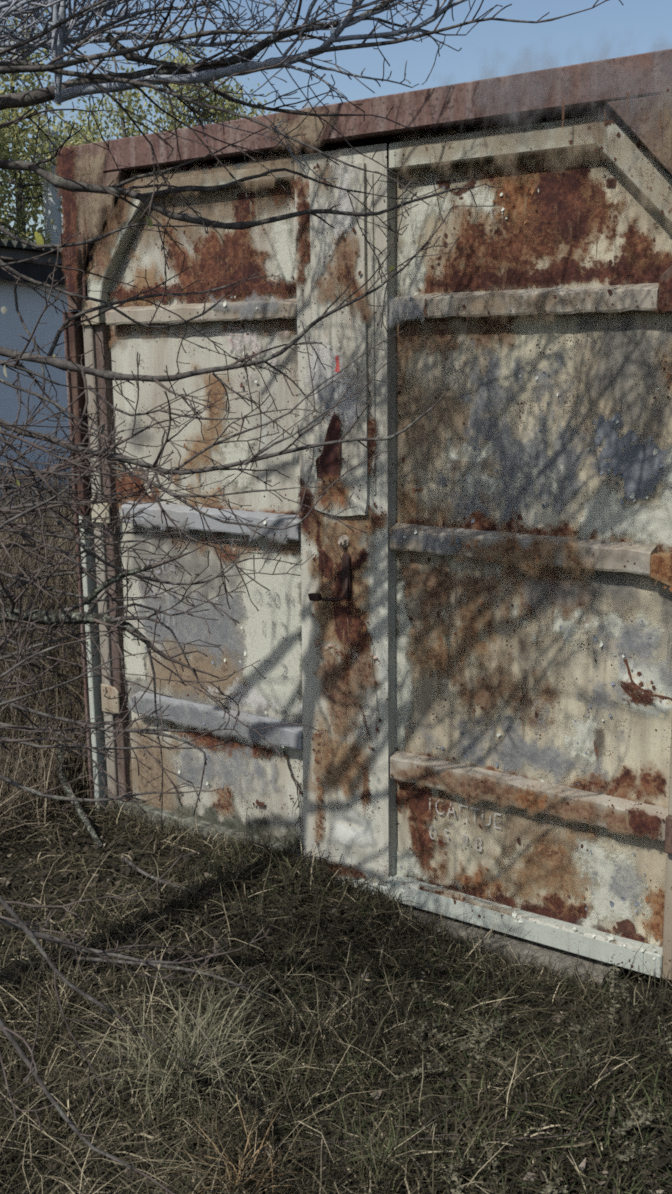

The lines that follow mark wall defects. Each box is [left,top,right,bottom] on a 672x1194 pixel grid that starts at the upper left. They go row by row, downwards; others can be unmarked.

corrosion [108,324,181,346]
corrosion [55,144,372,320]
corrosion [221,319,294,337]
corrosion [396,117,672,466]
corrosion [115,464,168,507]
peeling [438,351,672,533]
corrosion [172,367,636,844]
corrosion [650,544,672,676]
corrosion [618,681,662,706]
corrosion [129,718,282,812]
corrosion [319,858,366,878]
corrosion [390,748,666,947]